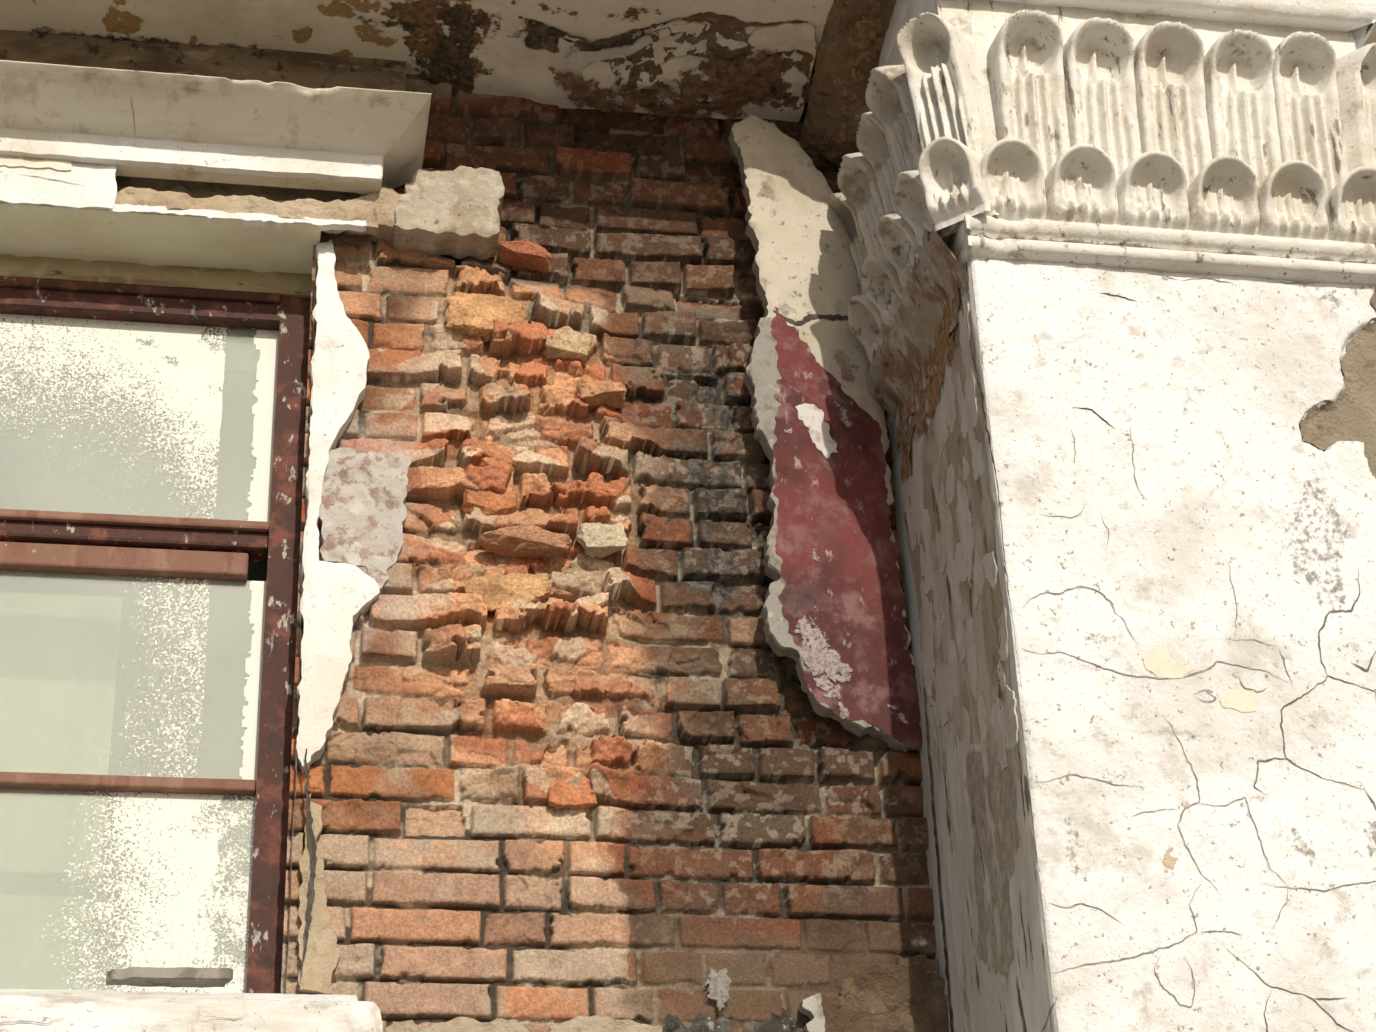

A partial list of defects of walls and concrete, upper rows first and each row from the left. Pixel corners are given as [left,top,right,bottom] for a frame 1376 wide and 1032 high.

spalling [518,12,817,118]
spalling [115,176,379,235]
spalling [445,292,526,342]
spalling [1300,290,1376,479]
flaking render [319,447,412,594]
spalling [461,489,628,611]
peeling [896,292,1021,978]
crack [947,575,971,640]
crack [960,298,1376,1032]
spalling [297,794,341,995]
spalling [385,1017,530,1032]
damp [661,1008,805,1032]